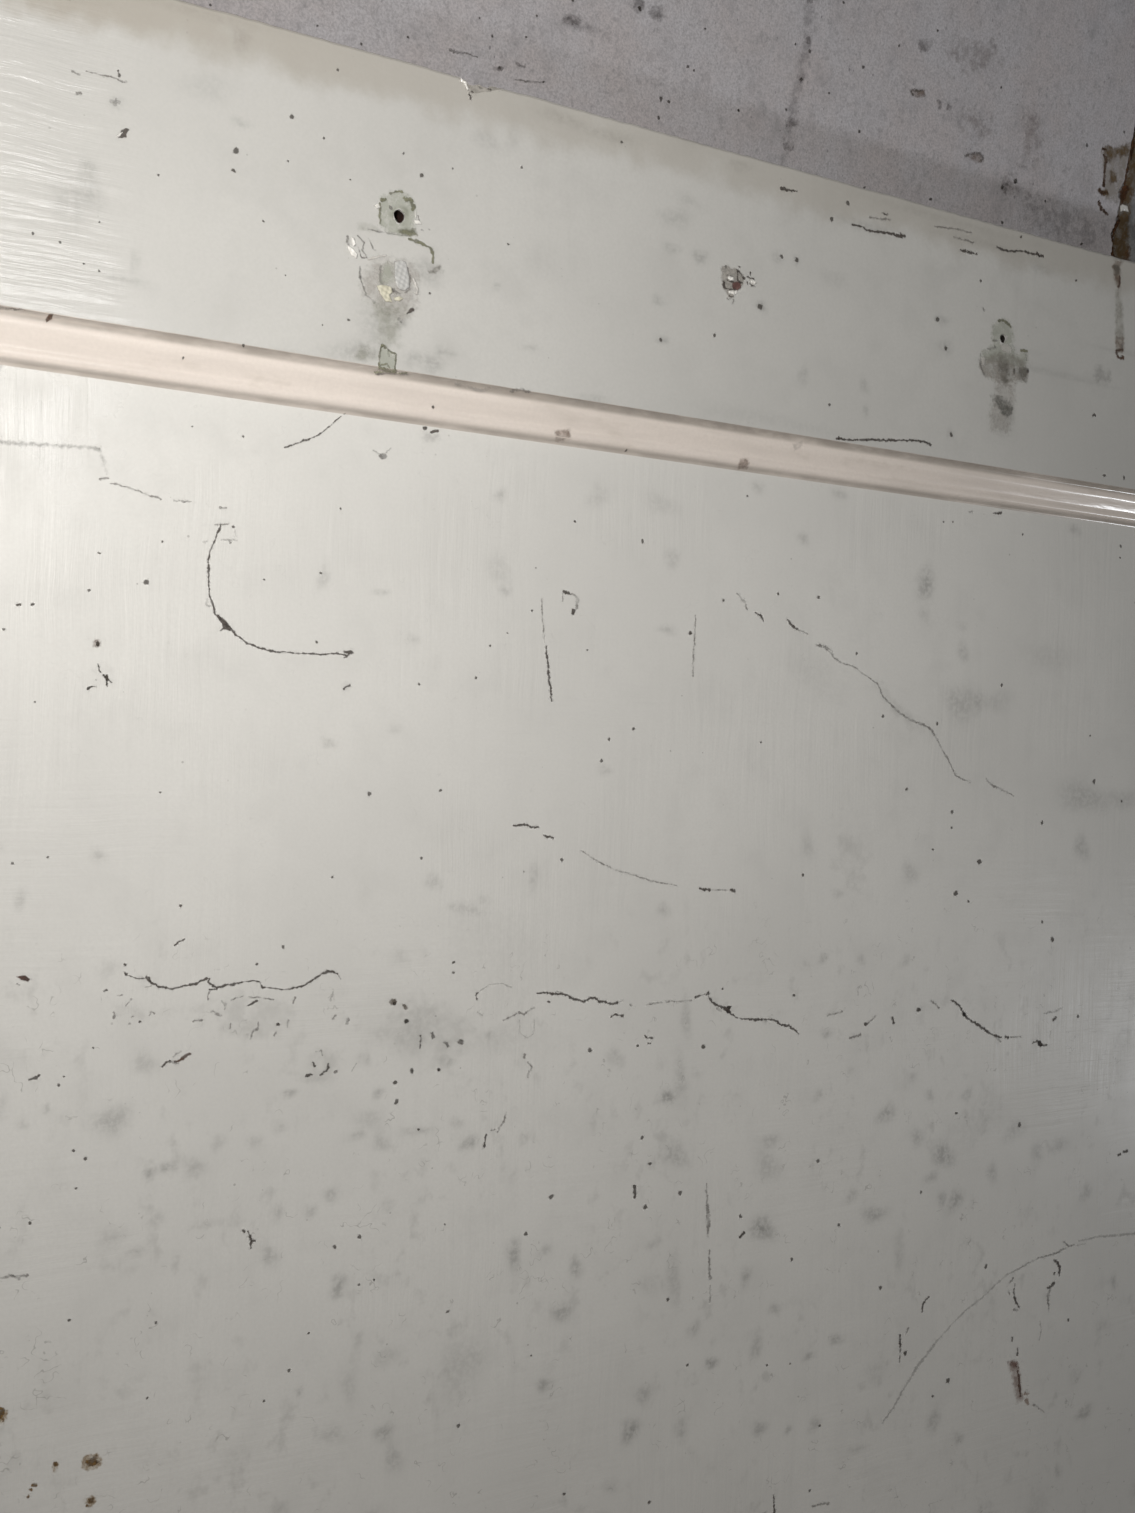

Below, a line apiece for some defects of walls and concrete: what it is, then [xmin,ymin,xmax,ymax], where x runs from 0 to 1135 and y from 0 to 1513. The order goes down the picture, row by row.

rust [1110,128,1135,288]
peeling [347,190,440,314]
spalling [722,266,756,298]
peeling [374,344,407,374]
peeling [980,319,1029,382]
crack [124,963,338,990]
crack [695,991,799,1034]
crack [835,1000,1057,1047]